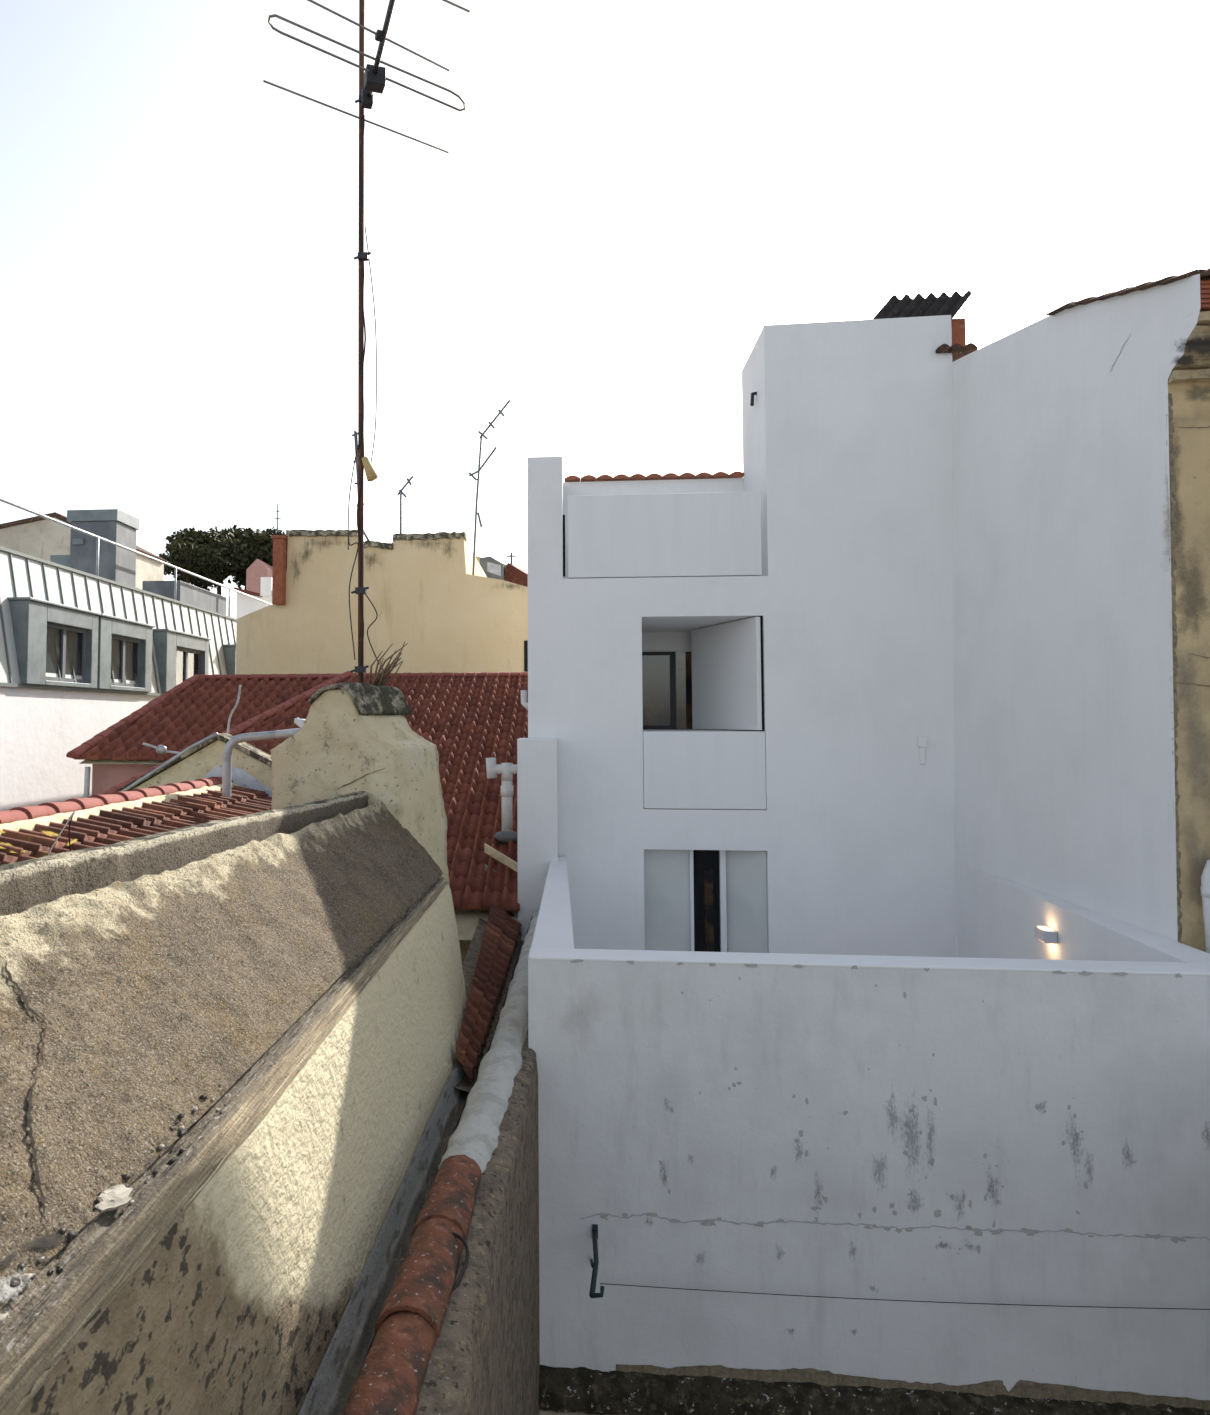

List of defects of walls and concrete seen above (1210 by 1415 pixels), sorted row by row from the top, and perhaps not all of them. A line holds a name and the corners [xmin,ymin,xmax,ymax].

water stain [1174,335,1210,366]
crack [0,956,47,1224]
crack [581,1213,1210,1243]